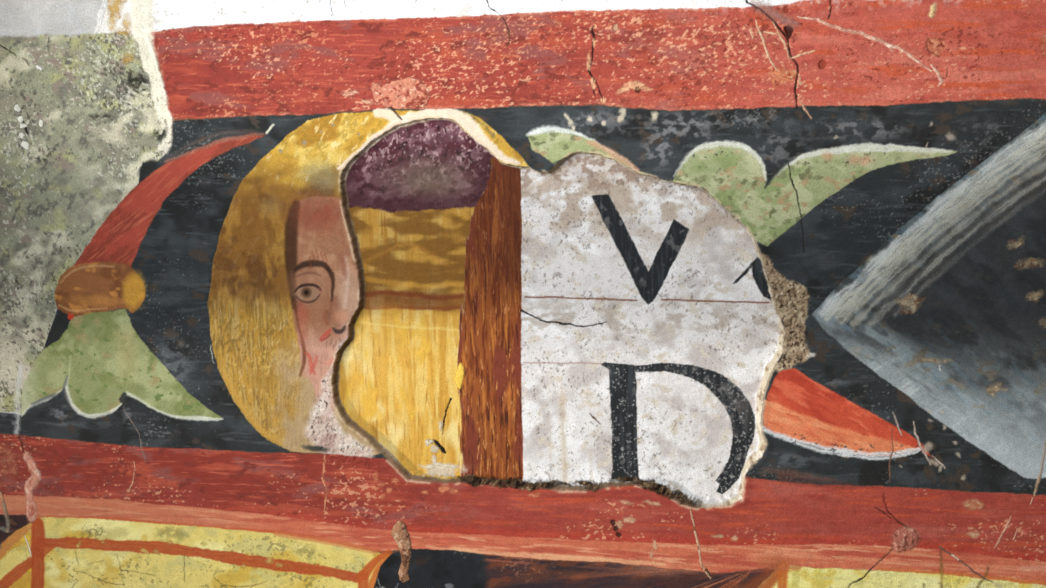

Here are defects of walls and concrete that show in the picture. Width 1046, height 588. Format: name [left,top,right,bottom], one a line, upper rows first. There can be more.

crack [746,0,799,108]
flaking render [0,32,166,415]
flaking render [332,117,814,508]
peeling [900,295,919,313]
peeling [611,518,635,537]
crack [877,440,909,528]
crack [939,547,1002,588]
crack [1034,442,1046,497]